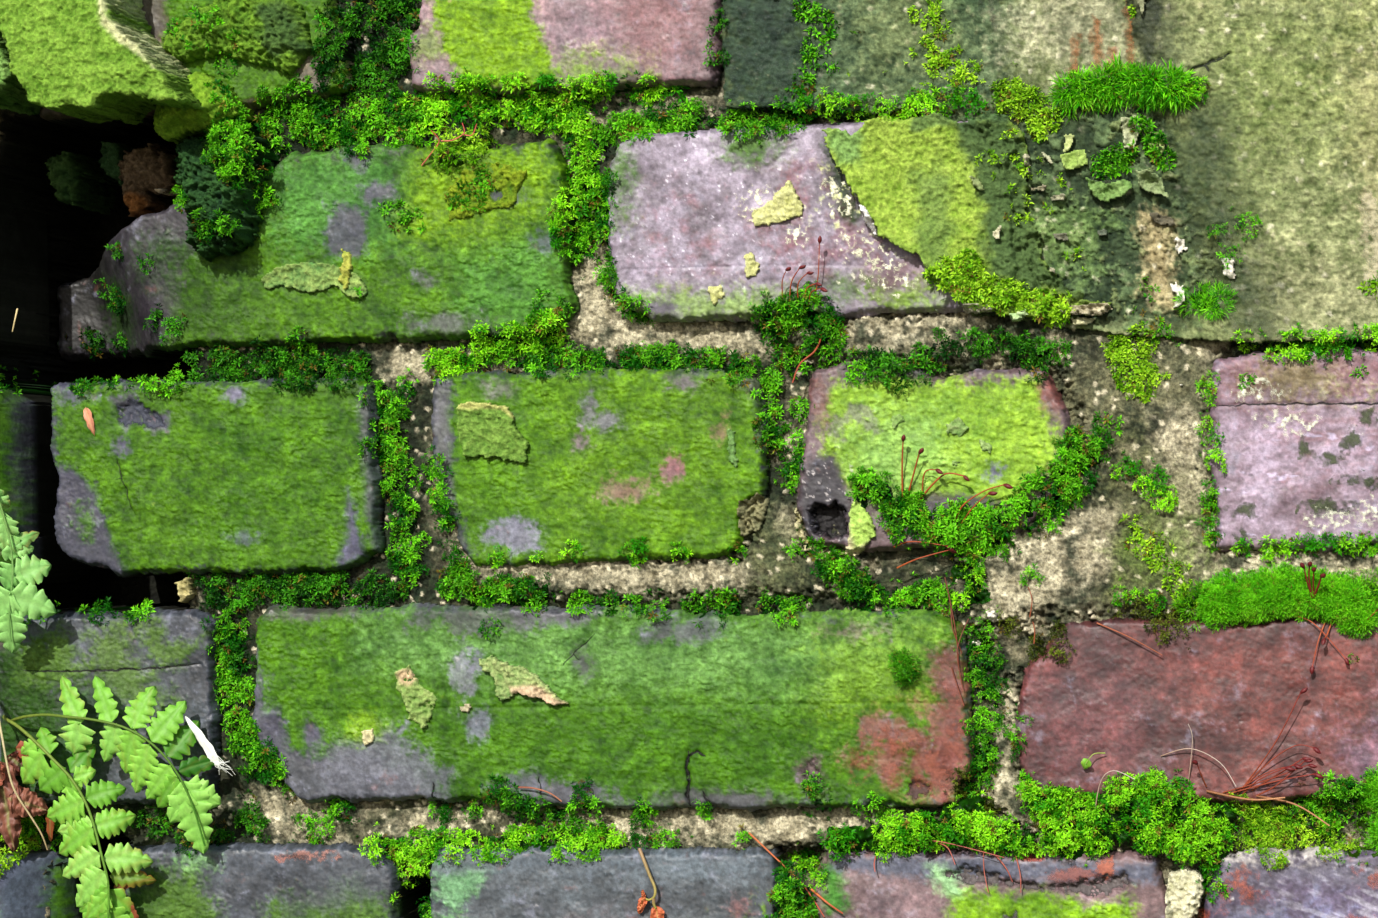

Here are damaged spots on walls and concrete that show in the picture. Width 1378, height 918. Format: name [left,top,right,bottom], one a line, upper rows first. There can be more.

spalling [811,502,847,538]